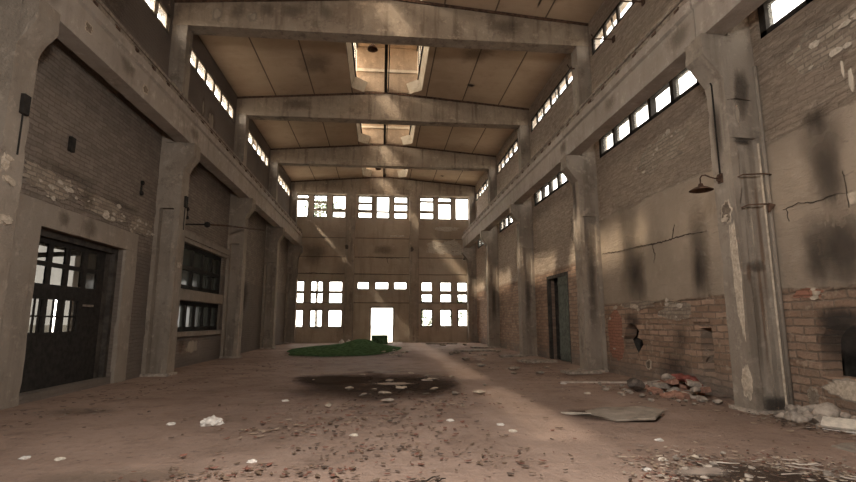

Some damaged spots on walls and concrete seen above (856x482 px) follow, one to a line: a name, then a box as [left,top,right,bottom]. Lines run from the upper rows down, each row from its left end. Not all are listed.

peeling [1,152,128,223]
crack [783,171,849,220]
crack [603,225,705,260]
spalling [807,378,856,405]